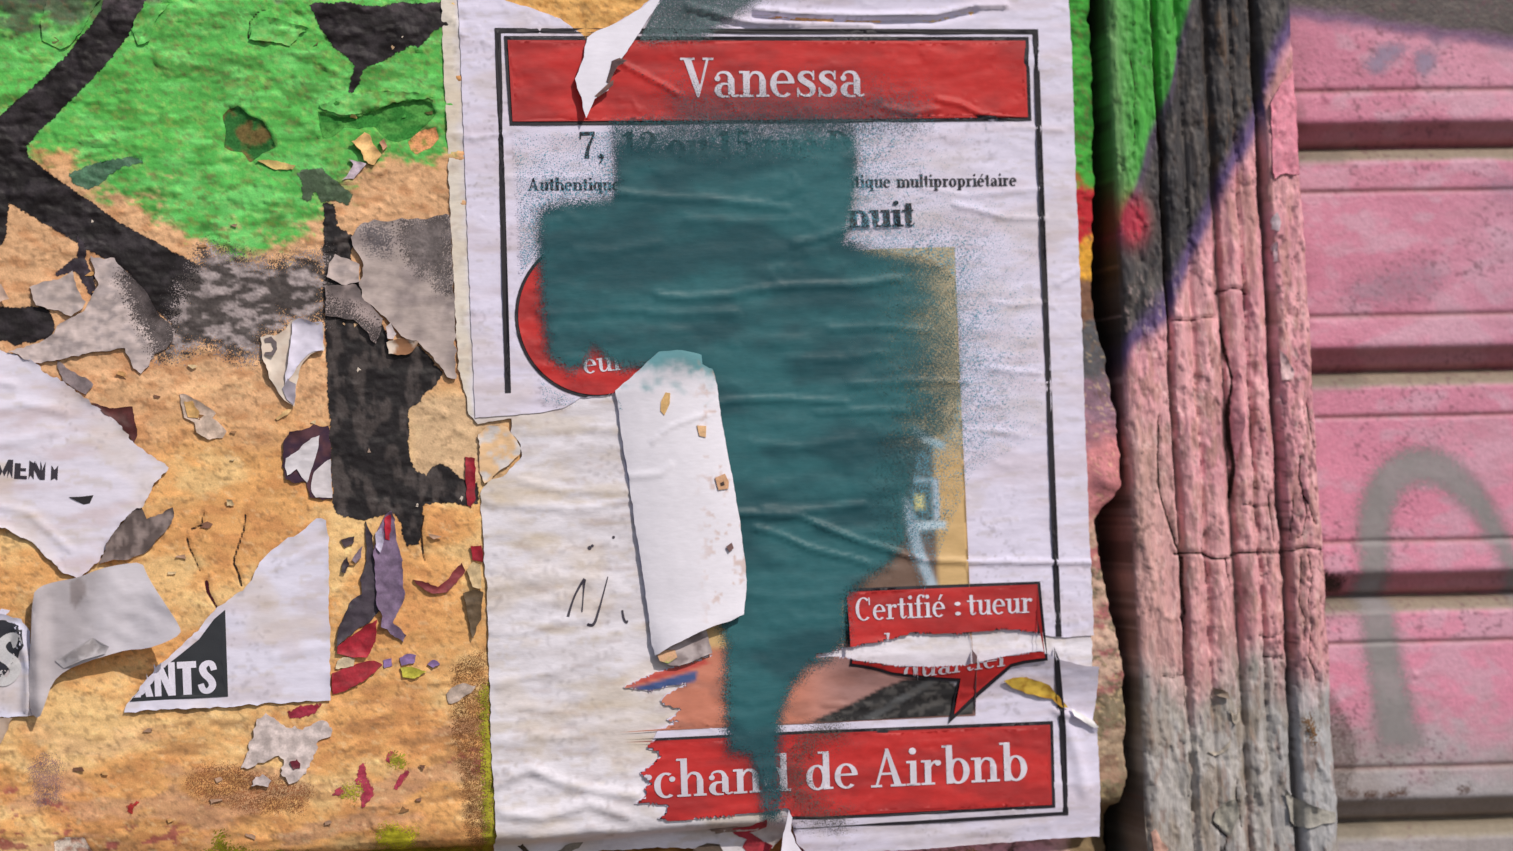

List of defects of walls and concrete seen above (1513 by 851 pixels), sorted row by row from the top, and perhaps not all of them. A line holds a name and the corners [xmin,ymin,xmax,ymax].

flaking render [223,106,295,170]
flaking render [318,90,439,180]
peeling [57,360,137,442]
peeling [180,394,227,440]
crack [1128,54,1322,678]
peeling [460,457,476,508]
crack [186,513,246,608]